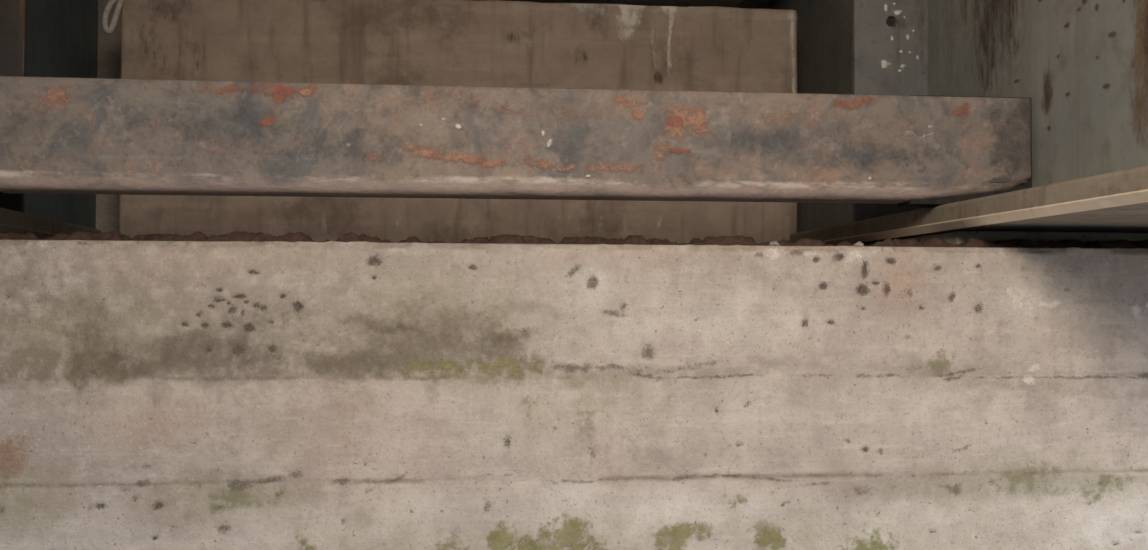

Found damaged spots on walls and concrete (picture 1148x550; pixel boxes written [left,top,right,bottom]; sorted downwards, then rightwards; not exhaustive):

water stain [574,4,645,39]
water stain [651,6,689,82]
corrosion [1122,0,1148,138]
corrosion [524,103,709,172]